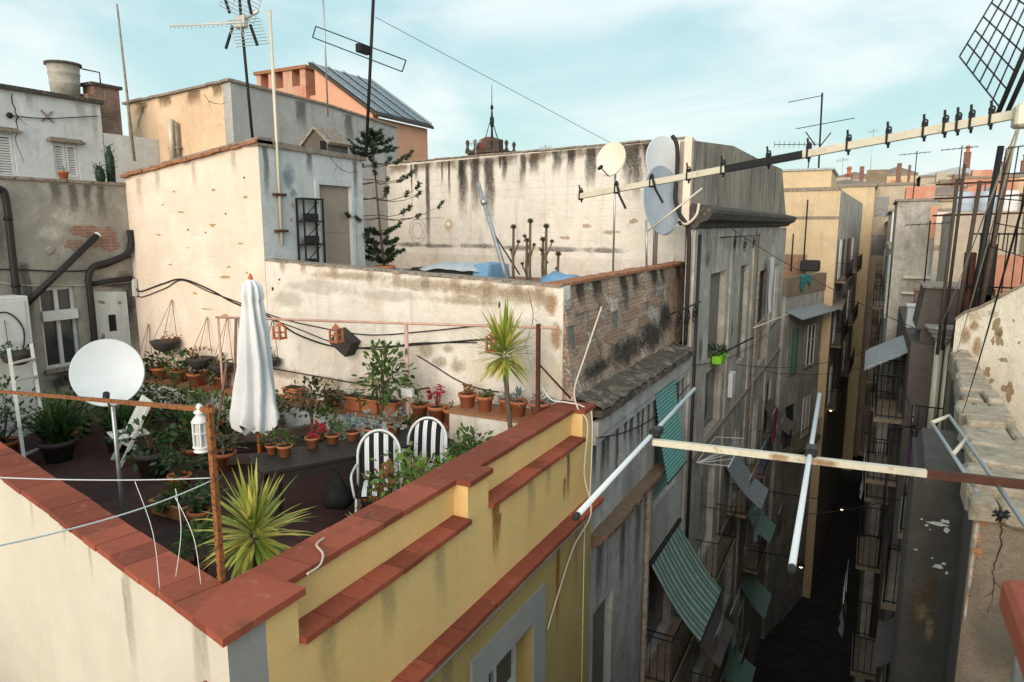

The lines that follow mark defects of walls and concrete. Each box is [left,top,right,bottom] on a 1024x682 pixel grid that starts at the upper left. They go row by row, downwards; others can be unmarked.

leakage [51,183,103,201]
leakage [390,147,603,231]
leakage [624,143,650,183]
spalling [64,225,119,251]
leakage [586,305,671,379]
peeling [983,318,1015,403]
peeling [921,518,950,533]
crack [984,524,1003,613]